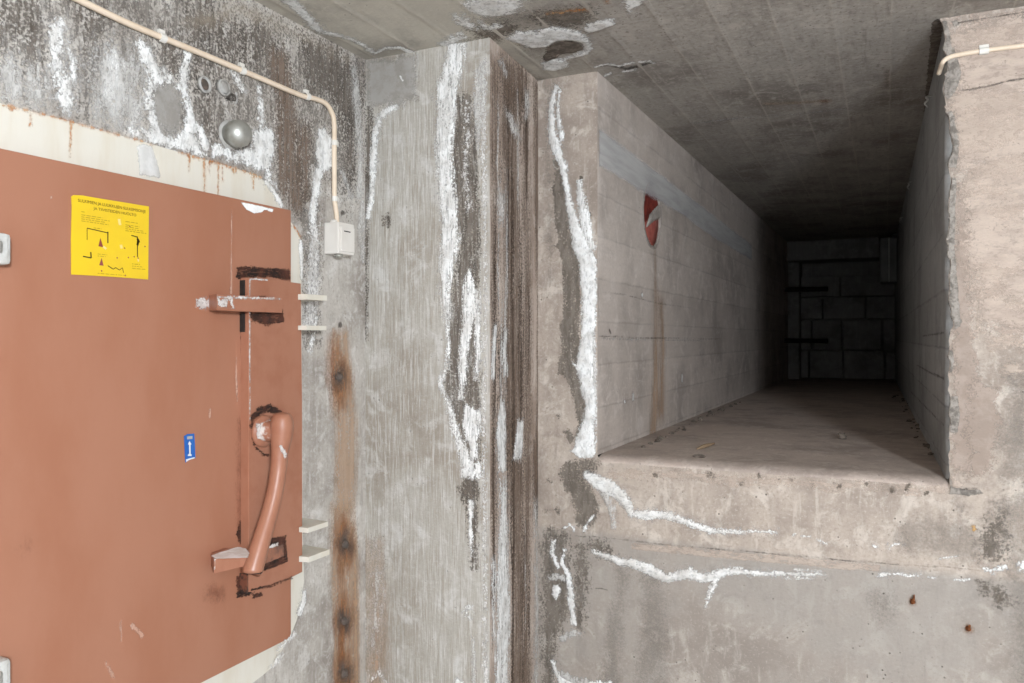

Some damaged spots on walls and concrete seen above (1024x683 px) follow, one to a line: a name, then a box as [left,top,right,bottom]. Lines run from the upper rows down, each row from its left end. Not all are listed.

damp [0,0,416,354]
corrosion [330,333,385,683]
spalling [543,40,585,62]
damp [434,0,825,683]